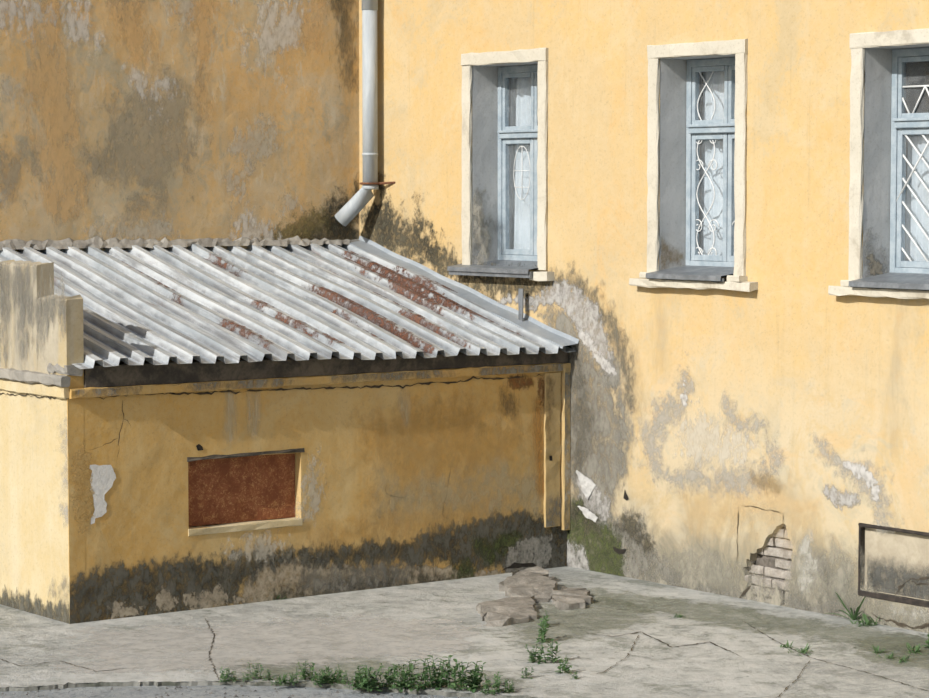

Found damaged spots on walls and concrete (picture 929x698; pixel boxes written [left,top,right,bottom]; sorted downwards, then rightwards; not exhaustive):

leakage [241,0,356,83]
leakage [0,0,104,222]
leakage [261,173,547,301]
rust [220,319,272,347]
rust [252,300,343,344]
spalling [62,448,116,532]
crack [91,374,545,457]
leakage [0,305,929,633]
peeling [576,470,610,527]
peeling [641,372,782,492]
peeling [817,441,888,531]
spalling [745,524,793,605]